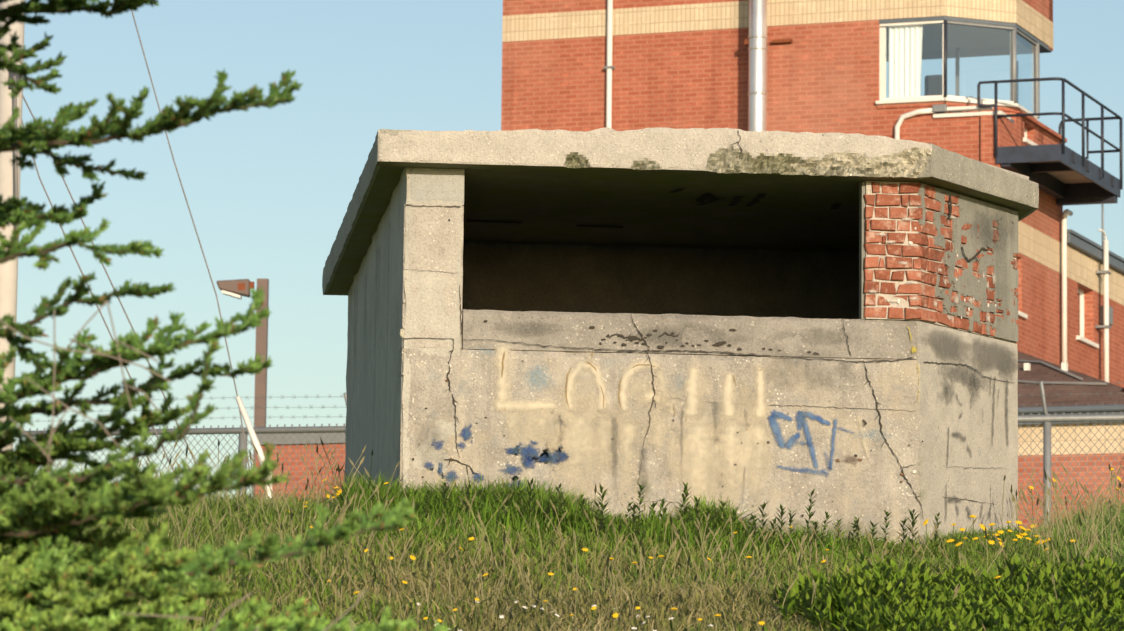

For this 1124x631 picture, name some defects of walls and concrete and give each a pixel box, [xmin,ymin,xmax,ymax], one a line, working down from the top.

peeling [706,146,1019,342]
crack [444,339,478,474]
crack [631,314,656,480]
crack [841,319,924,519]